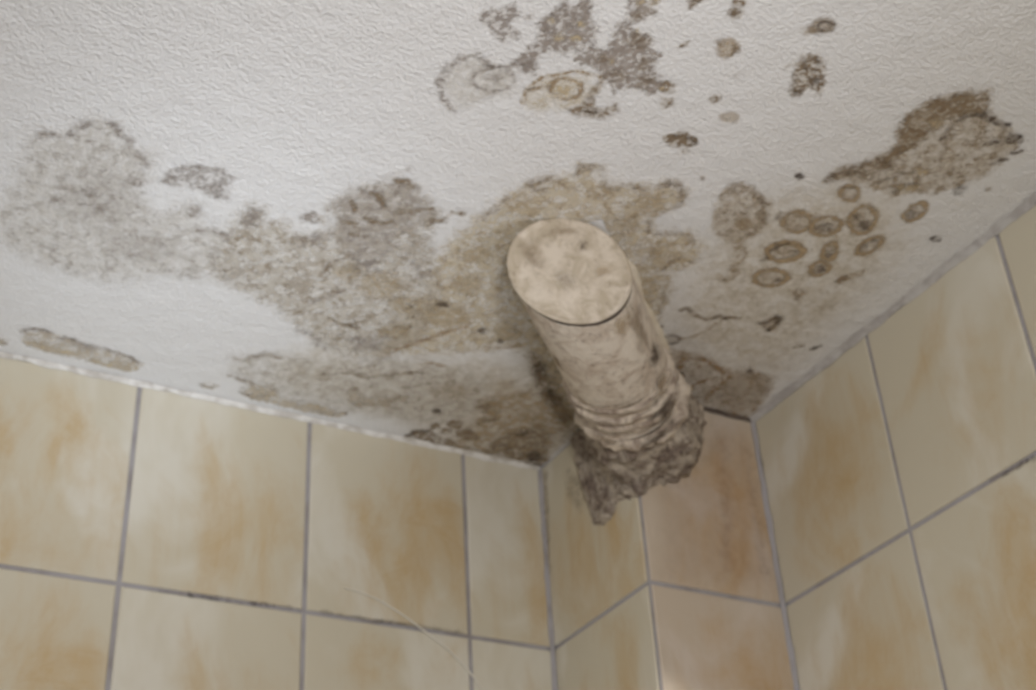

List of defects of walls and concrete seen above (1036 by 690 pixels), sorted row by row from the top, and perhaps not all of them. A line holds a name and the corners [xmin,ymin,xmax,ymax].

damp [473,0,674,118]
damp [752,94,1023,296]
peeling [21,328,139,372]
damp [215,165,698,466]